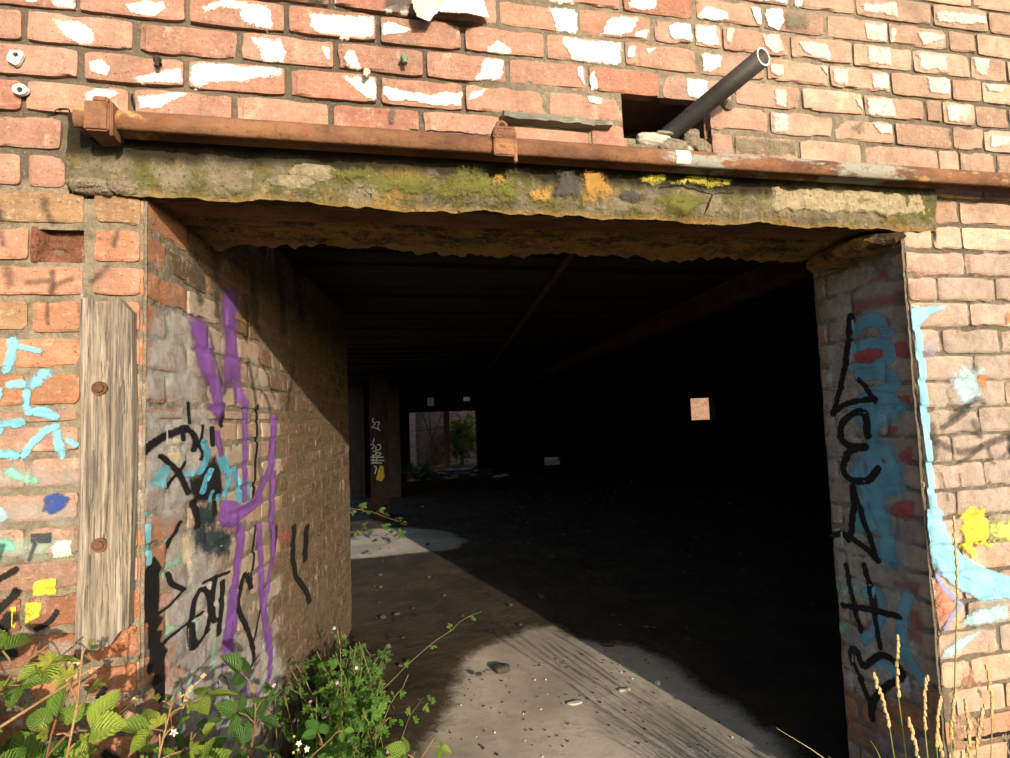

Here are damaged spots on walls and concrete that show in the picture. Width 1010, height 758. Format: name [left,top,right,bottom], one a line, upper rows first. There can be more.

damp [554,169,581,196]
corrosion [583,170,617,205]